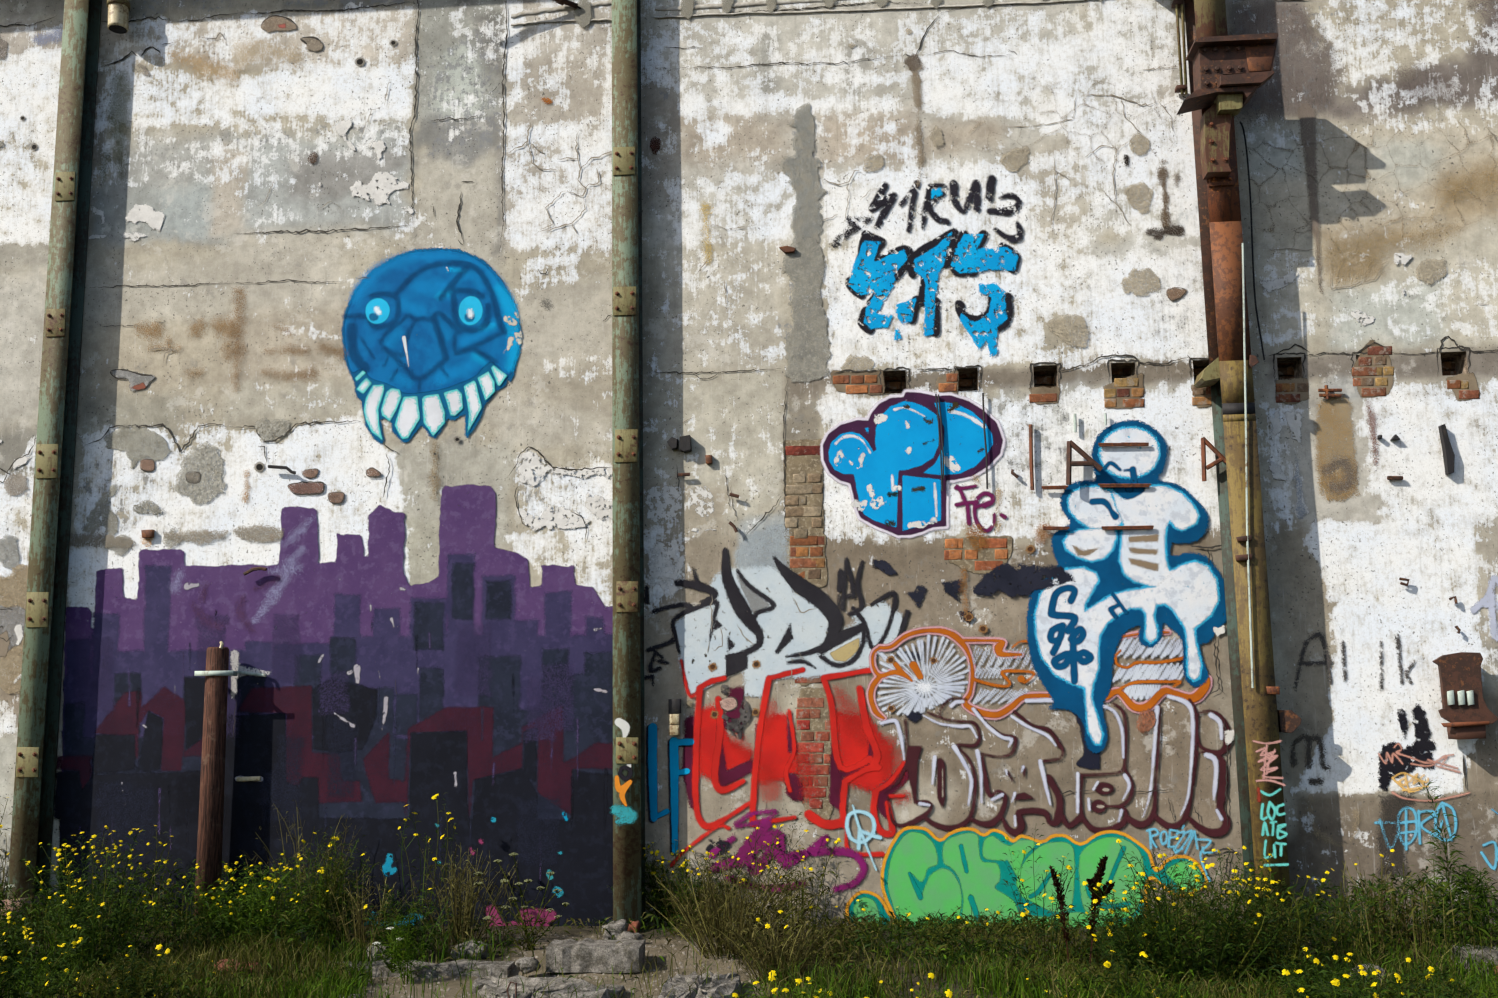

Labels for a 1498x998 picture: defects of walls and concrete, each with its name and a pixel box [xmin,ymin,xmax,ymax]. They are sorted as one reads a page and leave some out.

crack [102,0,612,251]
peeling [335,120,414,214]
rust [1155,159,1183,227]
crack [1248,128,1498,292]
spalling [1029,362,1061,405]
flaking render [1103,359,1146,409]
flaking render [1189,358,1212,408]
flaking render [1350,310,1394,398]
flaking render [1436,346,1481,401]
peeling [516,451,613,532]
flaking render [783,439,865,589]
peeling [850,484,902,512]